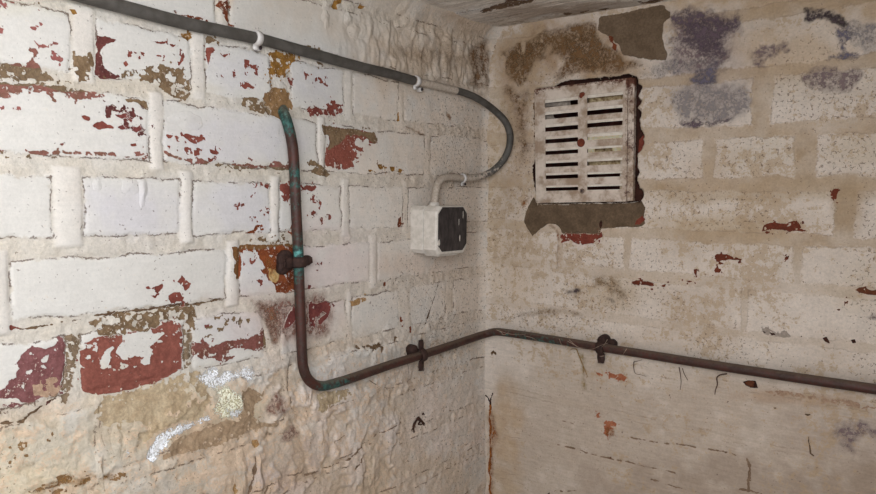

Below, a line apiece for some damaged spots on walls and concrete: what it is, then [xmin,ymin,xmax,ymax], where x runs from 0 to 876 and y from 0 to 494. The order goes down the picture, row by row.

peeling [0,22,193,160]
peeling [221,49,300,122]
leakage [657,9,748,128]
leakage [754,45,790,66]
leakage [802,8,876,91]
peeling [163,131,290,210]
peeling [301,45,378,225]
peeling [560,221,603,245]
peeling [712,252,742,276]
peeling [762,220,806,235]
peeling [0,275,279,460]
leakage [147,367,254,462]